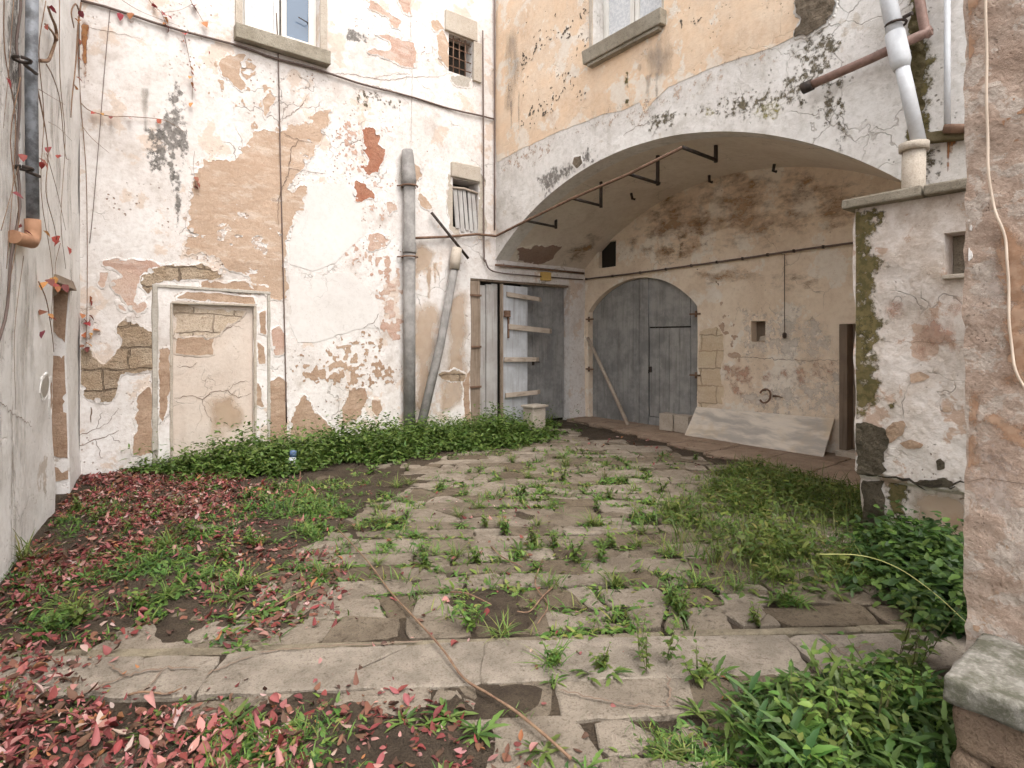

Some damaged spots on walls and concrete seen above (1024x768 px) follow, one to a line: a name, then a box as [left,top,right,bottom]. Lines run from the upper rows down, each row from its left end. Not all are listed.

flaking render [793,0,839,41]
damp [627,75,723,131]
damp [700,29,847,151]
damp [145,82,189,222]
damp [651,174,773,236]
peeling [79,52,404,460]
peeling [515,243,563,265]
crack [181,381,251,418]
crack [79,407,120,455]
spalling [855,421,923,529]